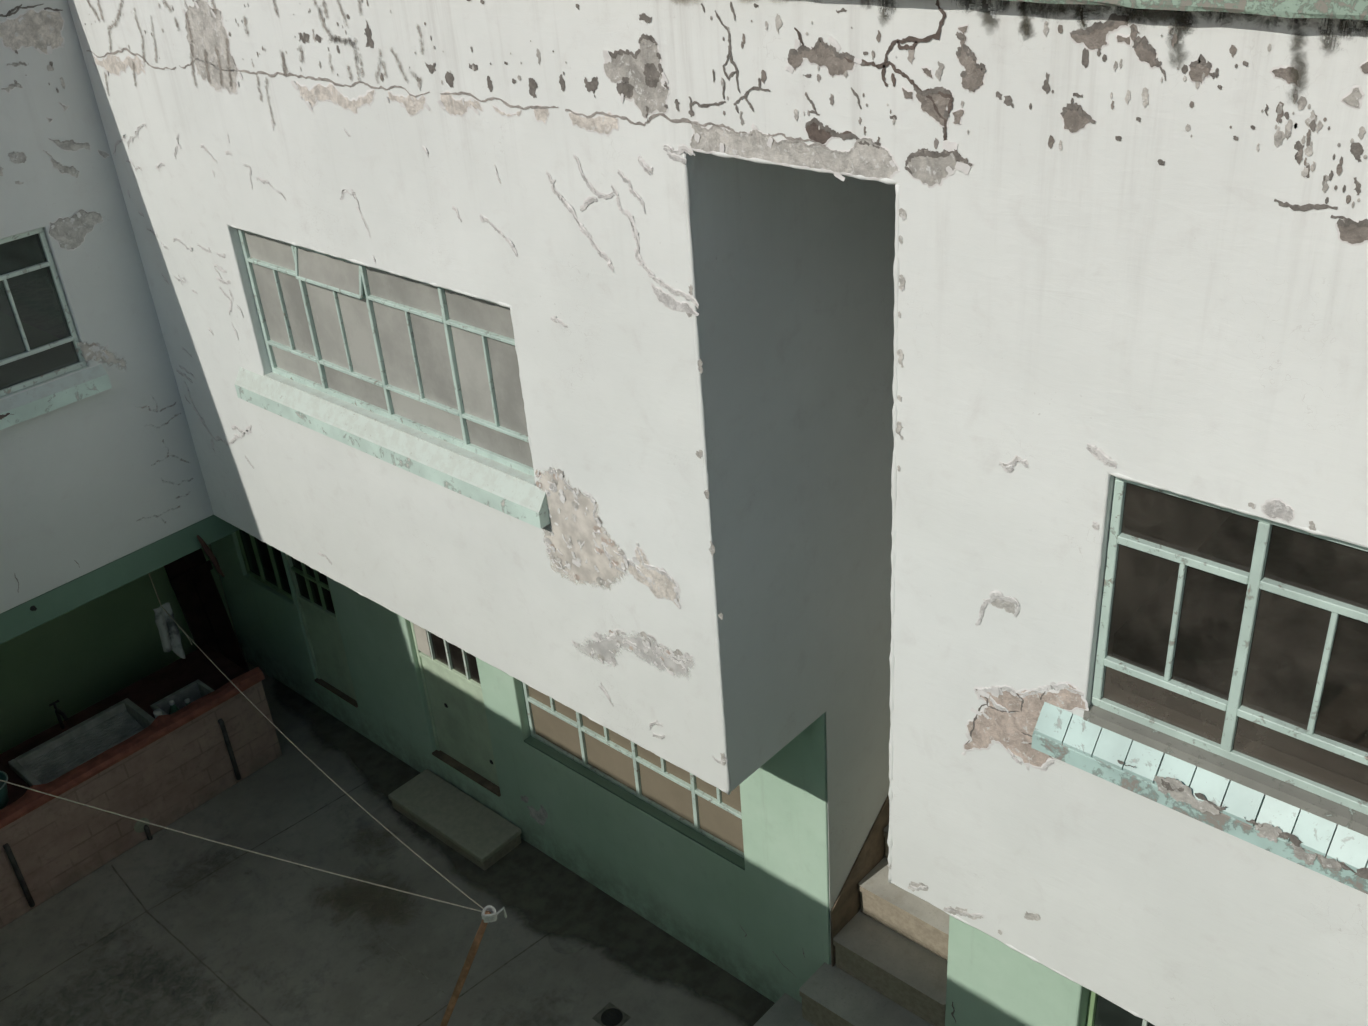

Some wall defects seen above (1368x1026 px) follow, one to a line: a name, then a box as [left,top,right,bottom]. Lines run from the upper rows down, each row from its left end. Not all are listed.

crack [87,2,825,146]
peeling [723,3,782,49]
flaking render [667,21,1032,188]
crack [844,0,971,174]
flaking render [1048,93,1096,151]
flaking render [1043,13,1248,137]
peeling [1230,44,1368,246]
peeling [535,467,681,609]
peeling [572,630,693,676]
peeling [962,681,1089,769]
flaking render [1153,775,1226,815]
flaking render [1244,817,1368,880]